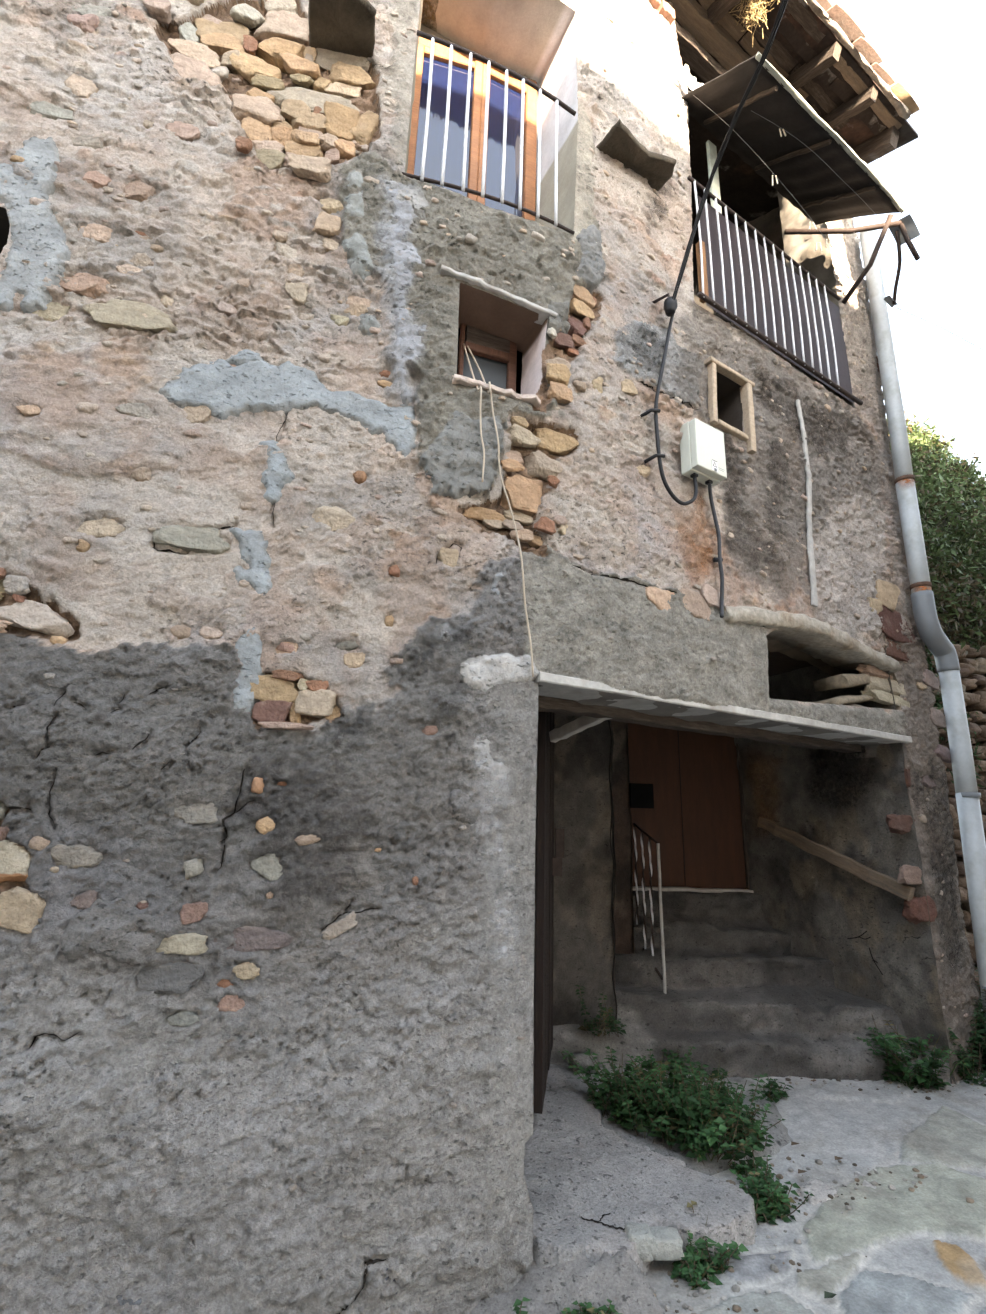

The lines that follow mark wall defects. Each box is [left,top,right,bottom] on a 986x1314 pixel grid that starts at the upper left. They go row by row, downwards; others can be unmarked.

flaking render [142,0,381,252]
flaking render [457,284,604,557]
leakage [757,374,849,453]
leakage [723,431,744,550]
flaking render [0,567,80,641]
flaking render [248,642,341,730]
flaking render [856,579,940,708]
crack [7,687,164,826]
flaking render [0,801,46,934]
crack [218,769,254,870]
crack [338,1259,386,1314]